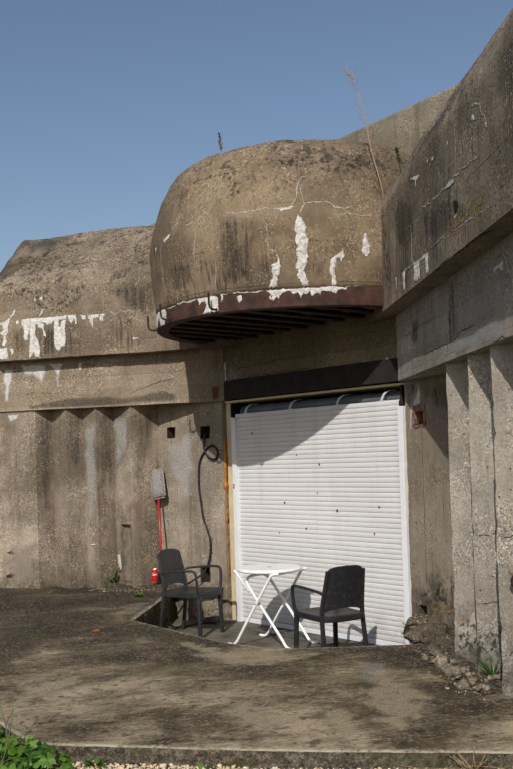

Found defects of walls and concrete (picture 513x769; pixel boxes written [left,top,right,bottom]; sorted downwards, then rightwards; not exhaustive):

leakage [156,214,359,327]
crack [154,176,380,290]
leakage [383,231,429,290]
crack [404,157,478,253]
crack [432,206,492,271]
leakage [33,391,173,409]